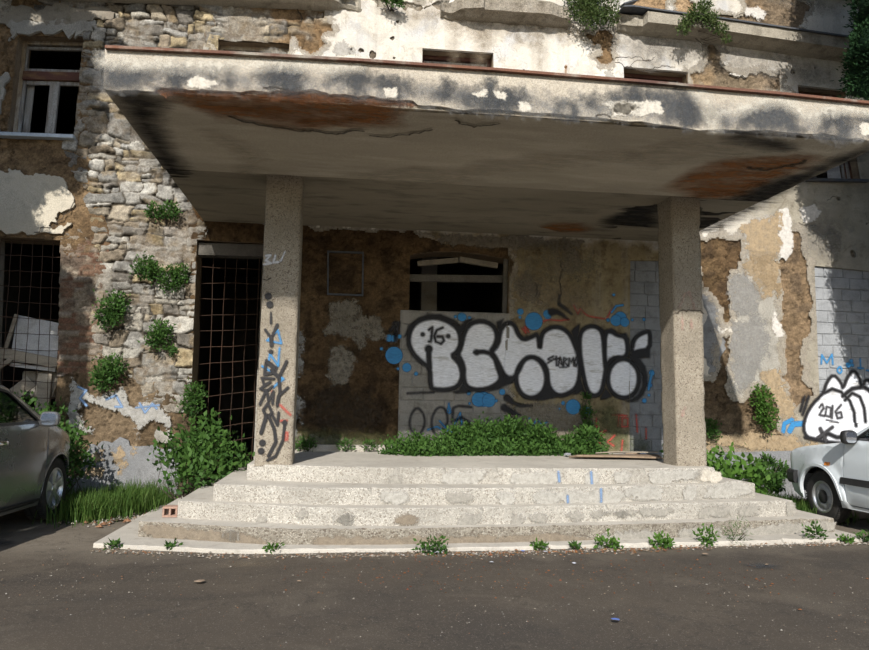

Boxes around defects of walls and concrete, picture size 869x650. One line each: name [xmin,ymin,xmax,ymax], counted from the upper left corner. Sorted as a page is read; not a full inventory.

spalling [634,0,696,12]
spalling [586,30,615,77]
spalling [683,44,787,92]
rust [162,89,400,127]
spalling [260,87,415,108]
water stain [100,55,869,209]
rust [675,156,810,199]
water stain [699,151,867,233]
water stain [605,204,659,239]
spalling [0,0,376,497]
spalling [295,225,514,445]
spalling [700,204,822,452]